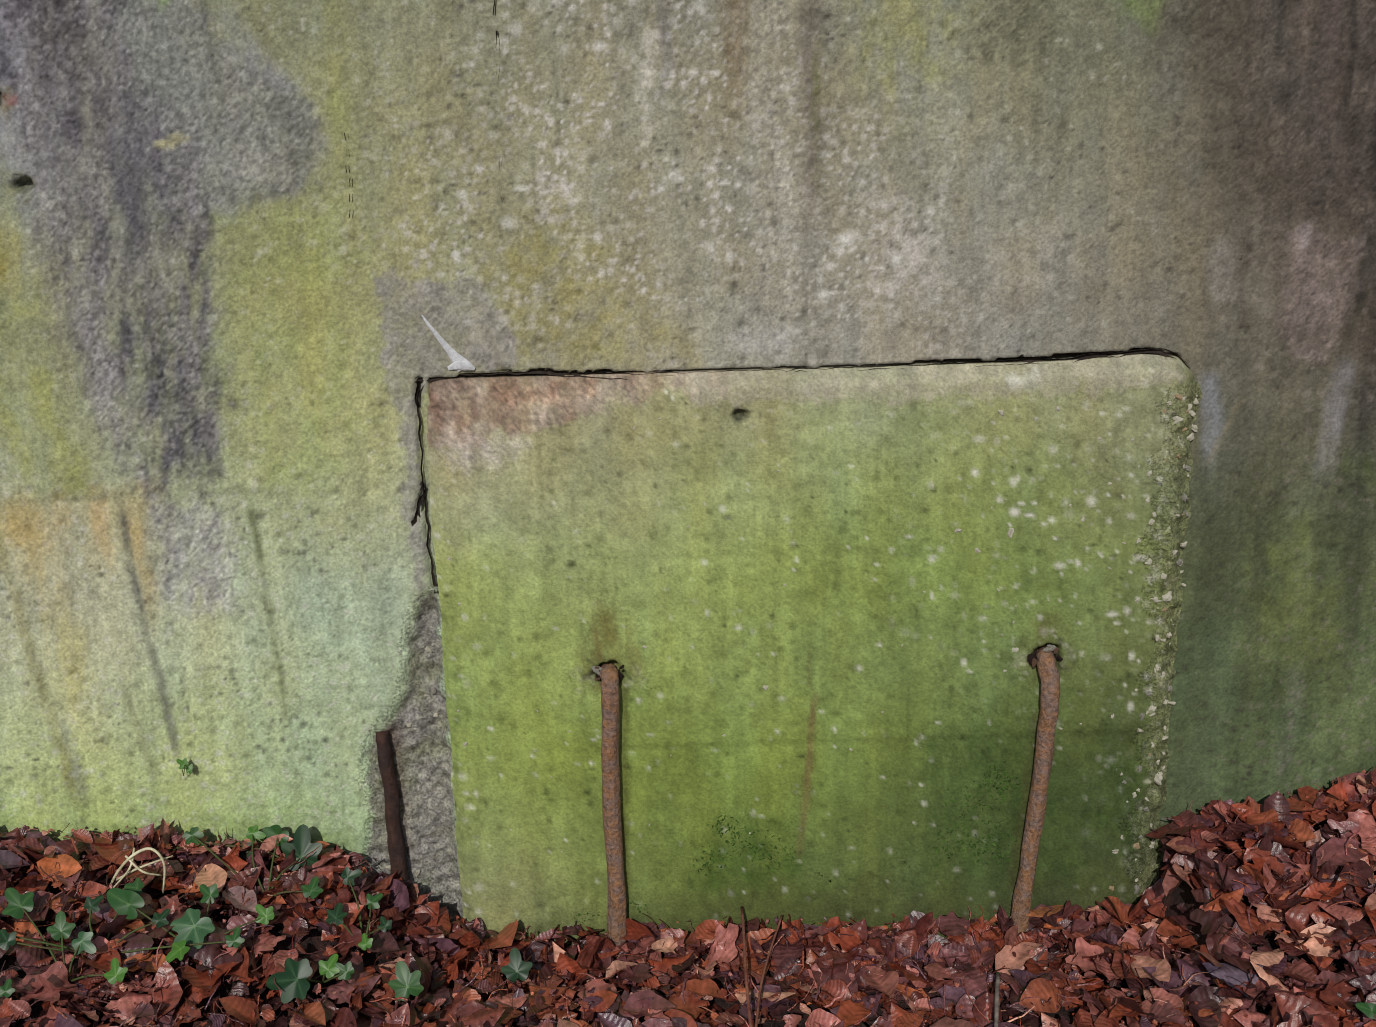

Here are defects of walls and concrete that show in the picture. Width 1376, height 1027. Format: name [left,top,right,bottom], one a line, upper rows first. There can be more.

damp [627,0,680,154]
damp [0,0,362,812]
damp [682,0,1312,858]
damp [1139,0,1376,721]
damp [487,891,608,948]
corrosion [566,591,655,903]
damp [627,791,1013,944]
corrosion [1007,596,1080,896]
damp [1030,857,1140,910]